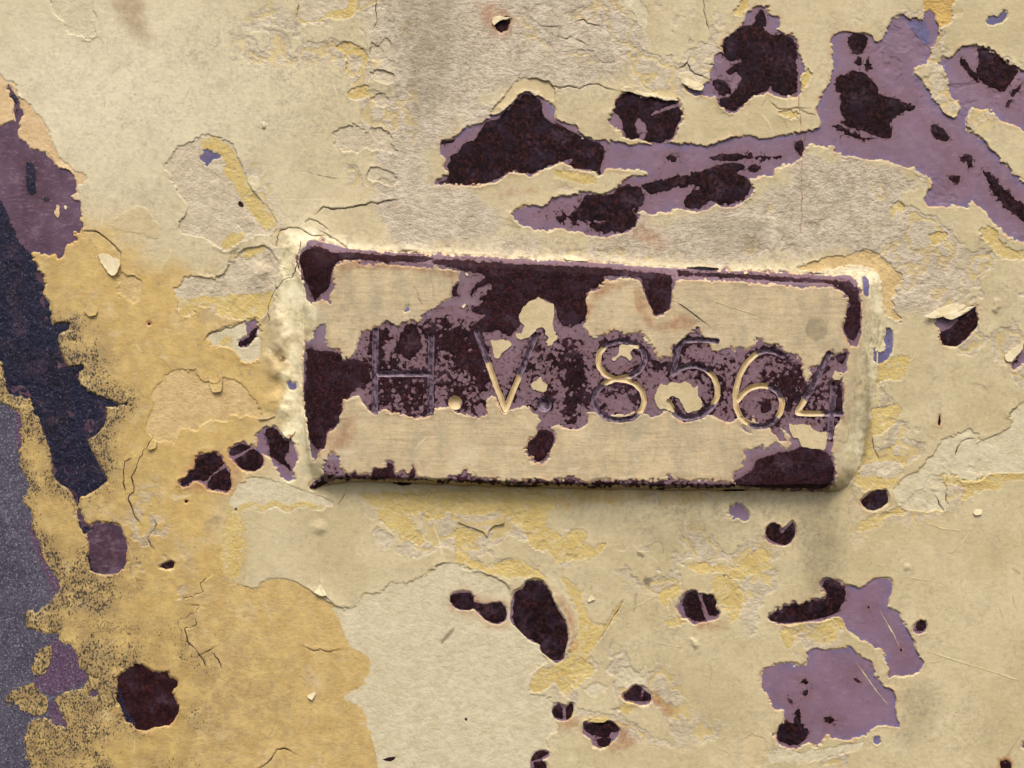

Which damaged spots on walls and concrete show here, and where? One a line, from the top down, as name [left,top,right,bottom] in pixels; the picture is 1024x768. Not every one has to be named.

peeling [435,0,1024,260]
peeling [0,76,86,268]
peeling [98,254,142,303]
peeling [164,134,278,363]
rust [924,304,978,347]
peeling [186,239,902,768]
rust [765,522,796,546]
rust [450,580,568,663]
rust [677,590,720,625]
rust [116,664,179,730]